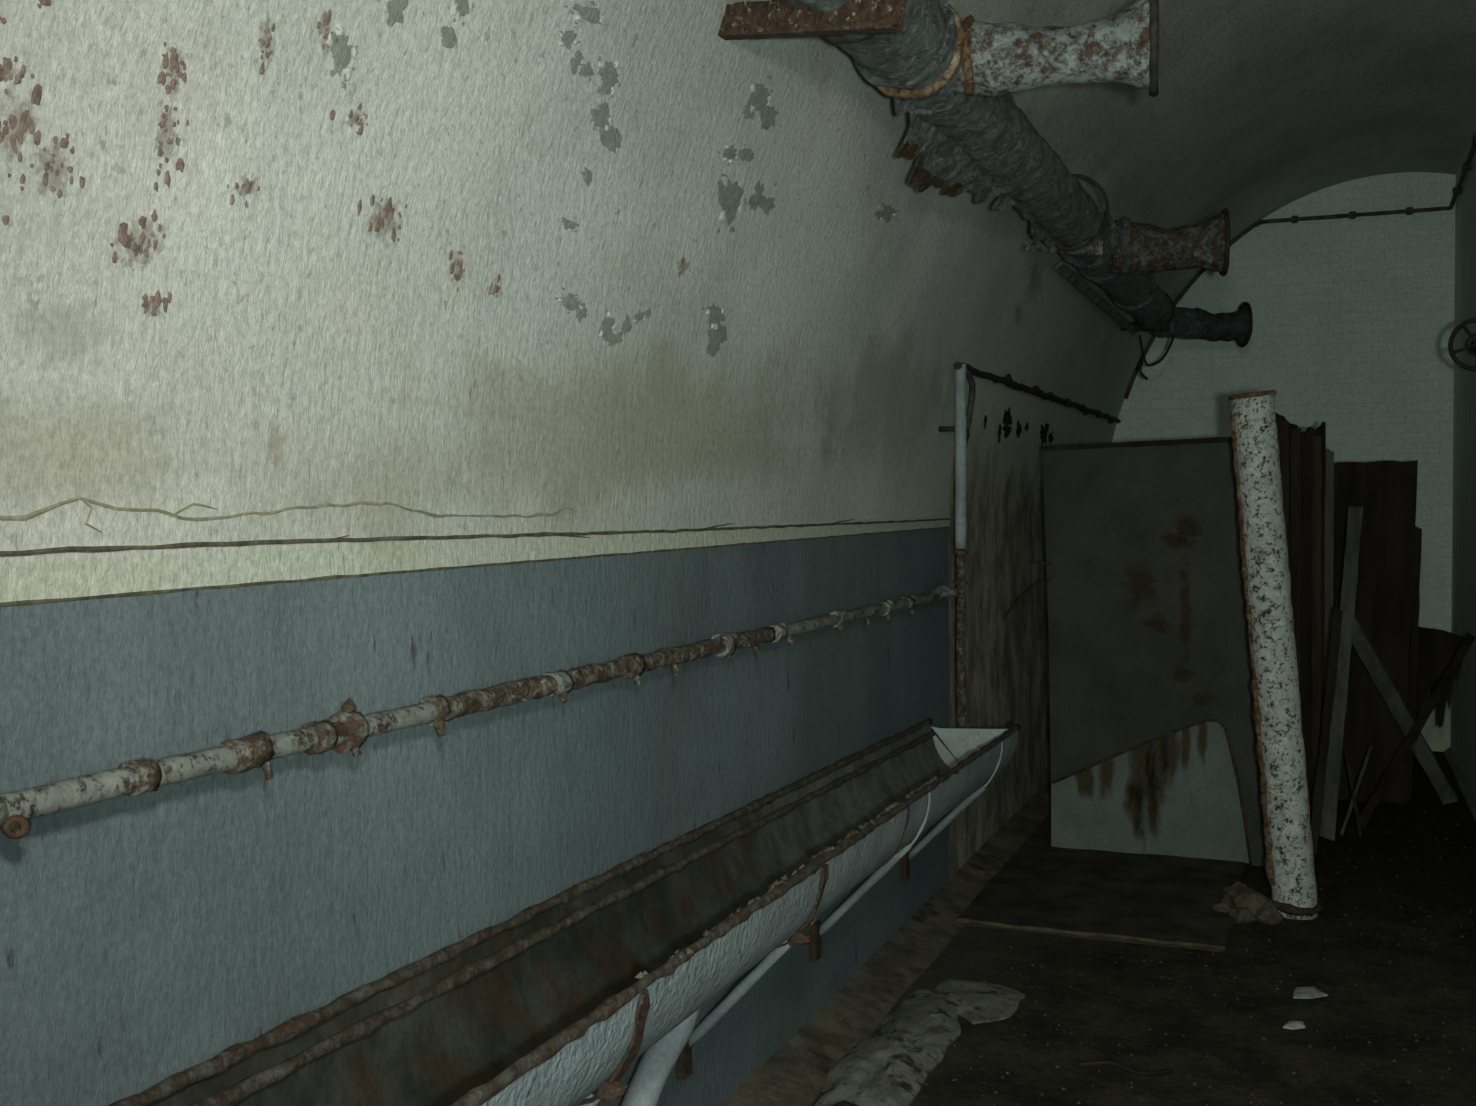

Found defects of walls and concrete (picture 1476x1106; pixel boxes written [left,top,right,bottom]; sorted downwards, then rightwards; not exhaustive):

peeling [386,0,409,27]
peeling [440,0,474,49]
rust [0,56,85,198]
rust [110,42,189,263]
rust [330,103,368,136]
peeling [557,0,622,154]
peeling [742,75,780,130]
peeling [717,143,776,234]
rust [357,194,407,243]
rust [141,290,172,316]
peeling [555,287,651,346]
crack [0,496,950,607]